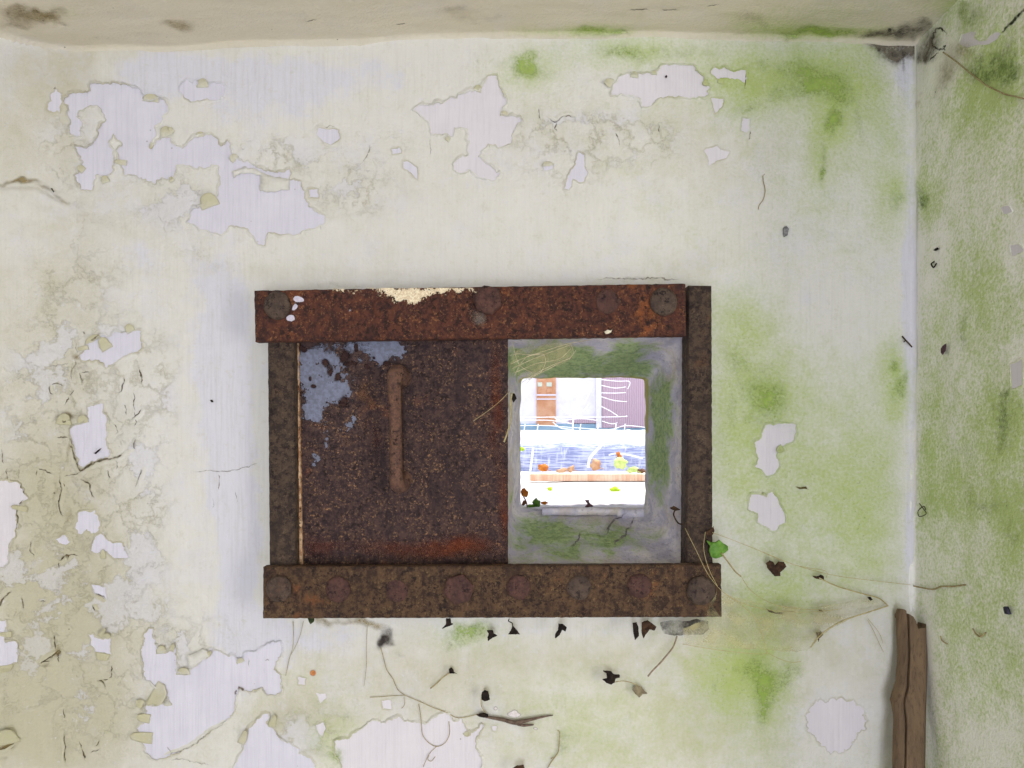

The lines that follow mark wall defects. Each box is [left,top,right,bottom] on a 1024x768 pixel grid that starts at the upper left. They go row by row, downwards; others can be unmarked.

damp [868,22,946,63]
peeling [604,63,750,116]
peeling [44,77,328,248]
peeling [411,73,524,183]
peeling [77,324,145,369]
corrosion [322,343,389,381]
peeling [56,399,114,469]
peeling [746,420,799,533]
peeling [0,477,29,571]
peeling [53,508,133,562]
peeling [0,618,21,673]
peeling [130,626,328,768]